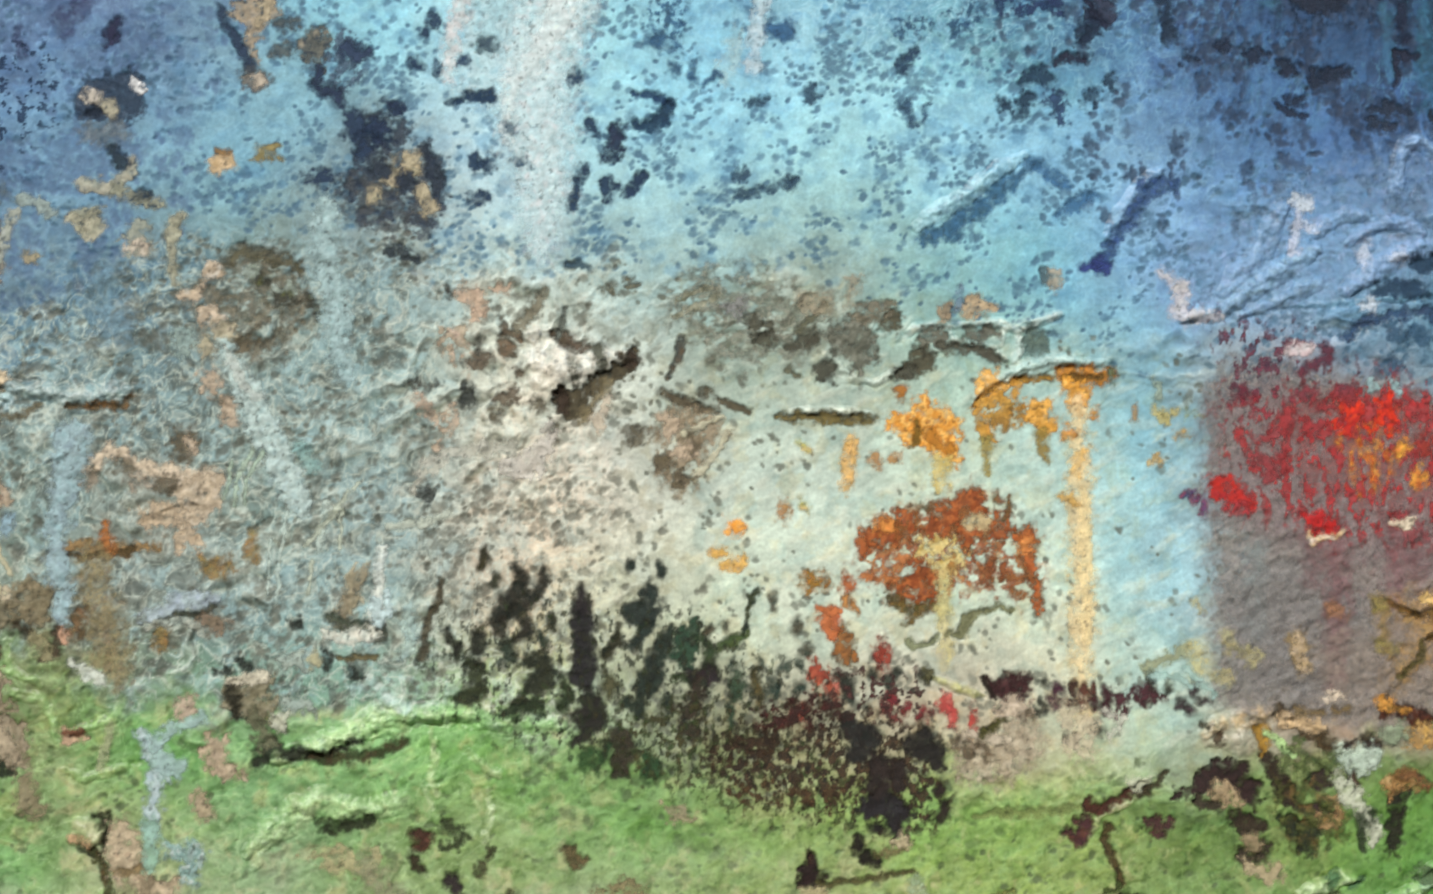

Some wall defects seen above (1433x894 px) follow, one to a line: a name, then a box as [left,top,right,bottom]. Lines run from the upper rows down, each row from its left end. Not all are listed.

peeling [218,0,500,264]
spalling [568,117,649,211]
spalling [732,166,800,200]
spalling [804,83,823,105]
spalling [669,265,1008,386]
spalling [408,282,641,503]
peeling [623,407,731,494]
rust [709,520,747,573]
rust [778,503,808,519]
rust [799,362,1117,718]
water stain [321,510,952,843]
rust [879,689,978,733]